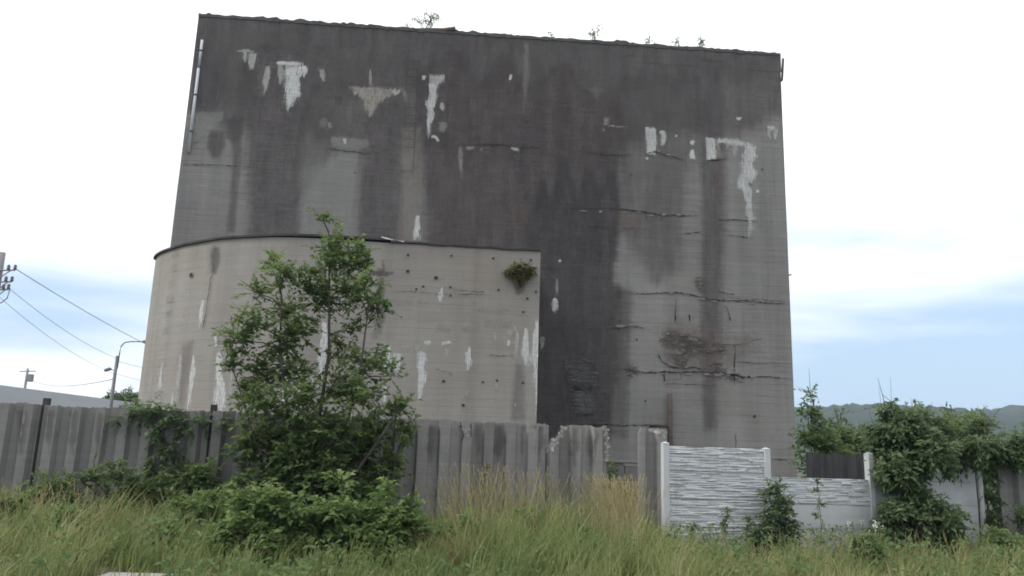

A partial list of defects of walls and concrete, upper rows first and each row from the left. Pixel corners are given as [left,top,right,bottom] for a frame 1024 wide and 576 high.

leakage [192,17,782,437]
crack [570,208,699,234]
crack [622,291,785,322]
crack [613,350,793,386]